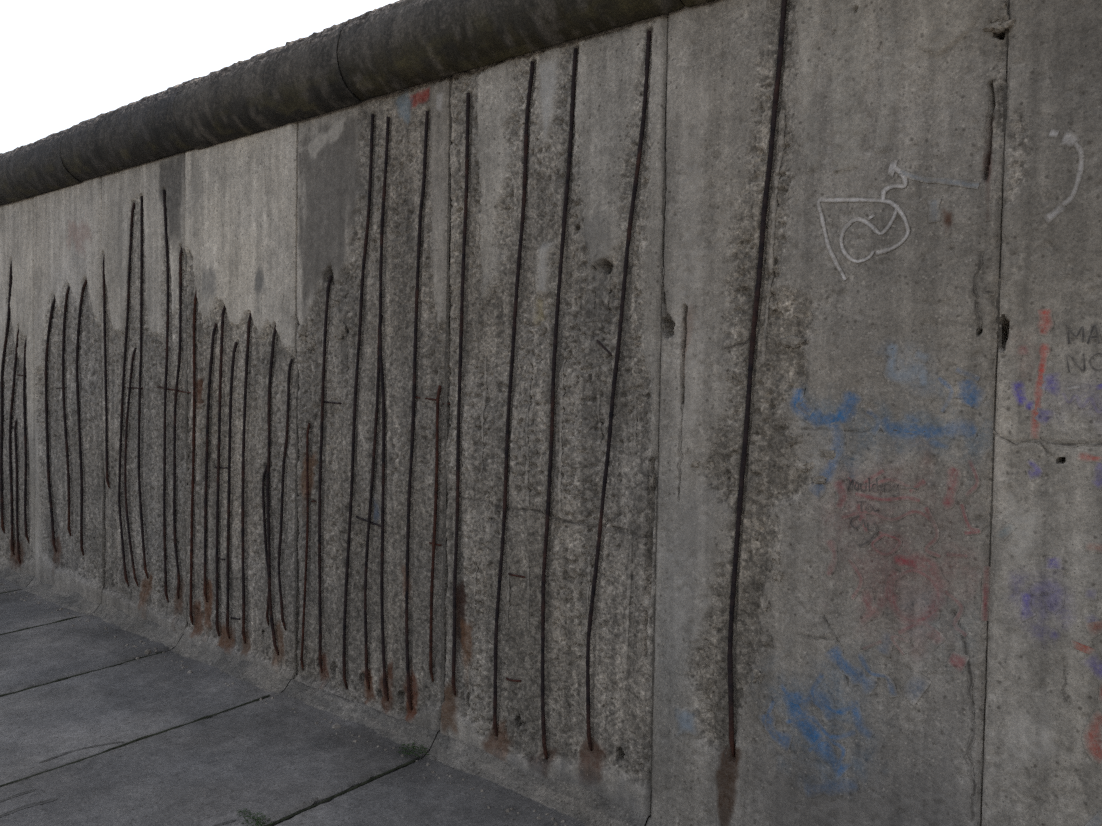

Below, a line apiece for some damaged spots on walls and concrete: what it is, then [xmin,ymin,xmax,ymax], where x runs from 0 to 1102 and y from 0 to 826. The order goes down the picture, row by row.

water stain [668,60,715,440]
water stain [760,114,786,364]
spalling [0,14,667,794]
spalling [683,0,836,757]
rust [188,574,253,661]
rust [360,655,421,723]
rust [440,578,476,738]
rust [575,734,611,777]
water stain [656,470,737,678]
rust [712,742,743,826]